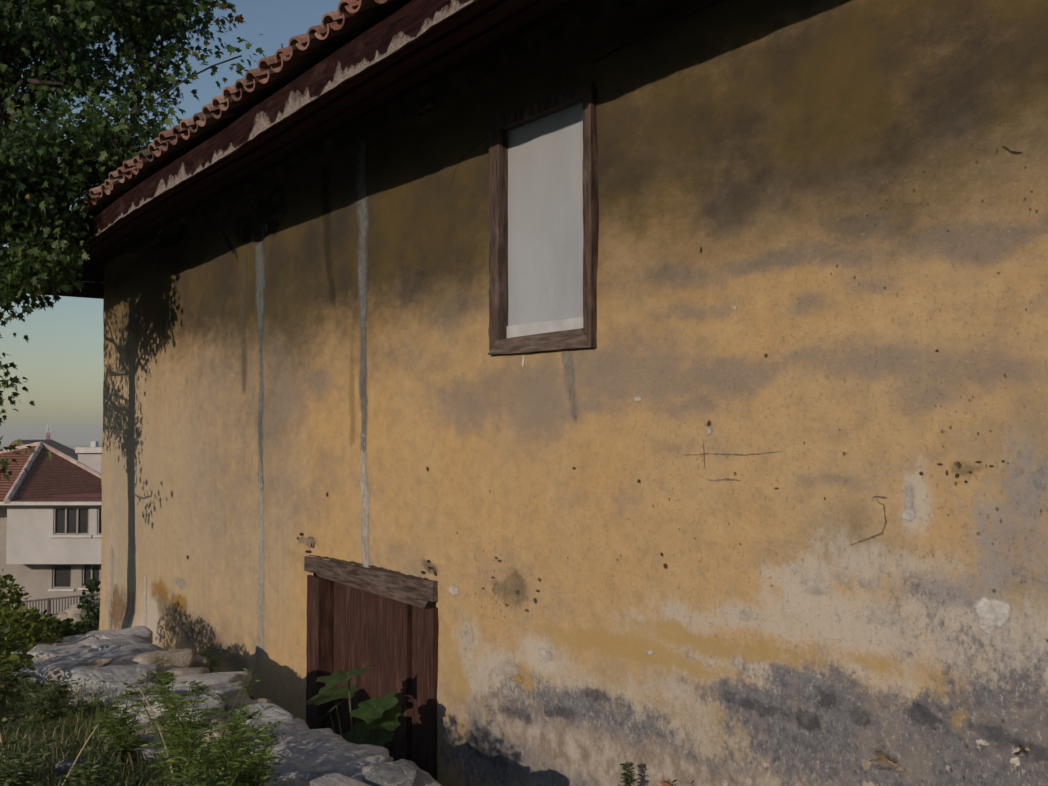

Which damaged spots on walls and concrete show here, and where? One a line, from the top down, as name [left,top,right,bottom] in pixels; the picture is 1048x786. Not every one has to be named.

damp [255,218,268,654]
damp [356,138,369,568]
flaking render [860,752,904,786]
peeling [970,724,1048,768]